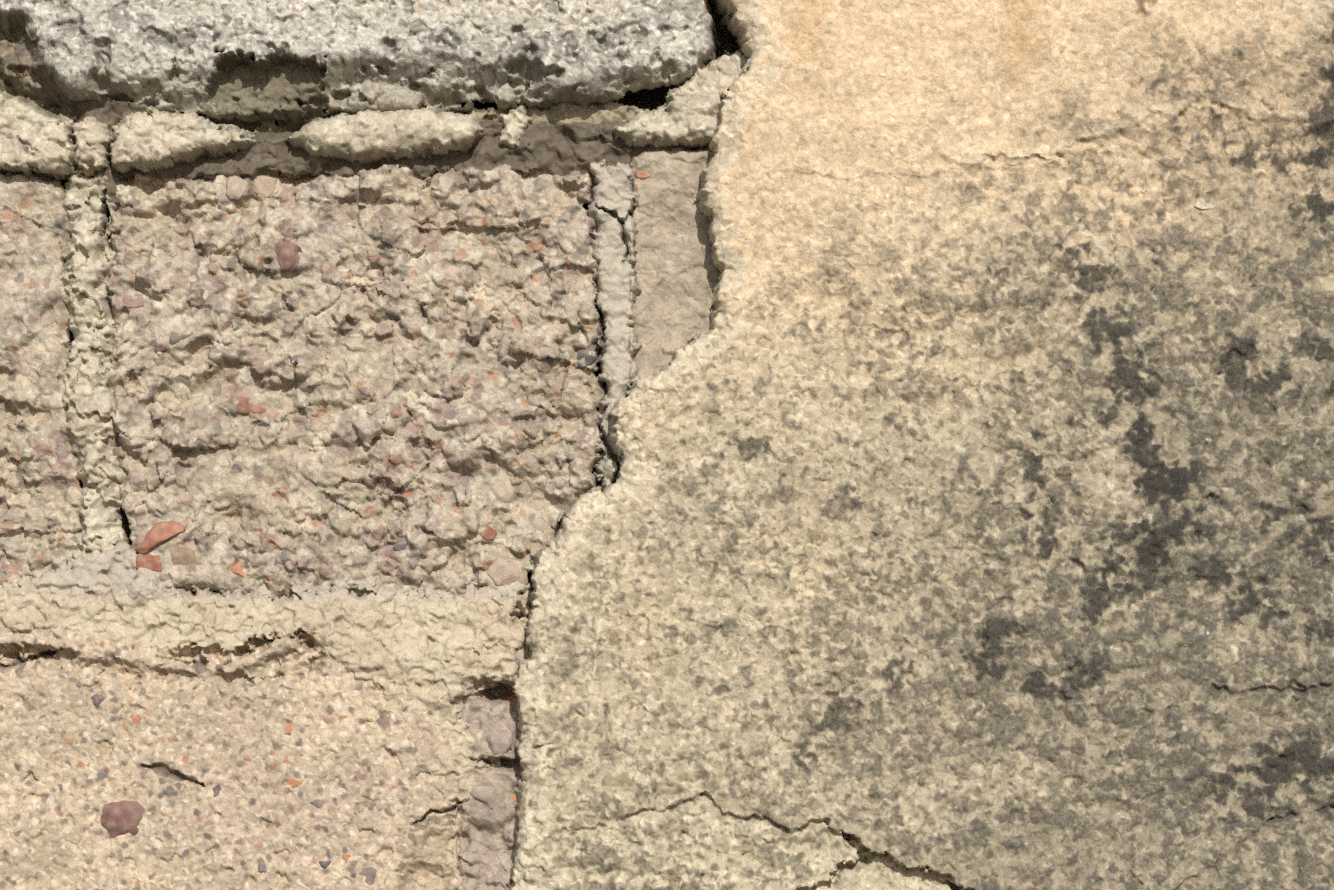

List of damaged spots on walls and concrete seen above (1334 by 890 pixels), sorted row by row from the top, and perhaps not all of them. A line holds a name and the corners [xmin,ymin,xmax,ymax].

crack [594,197,636,267]
crack [594,298,610,362]
crack [0,646,64,672]
crack [597,791,829,860]
crack [1170,804,1334,890]